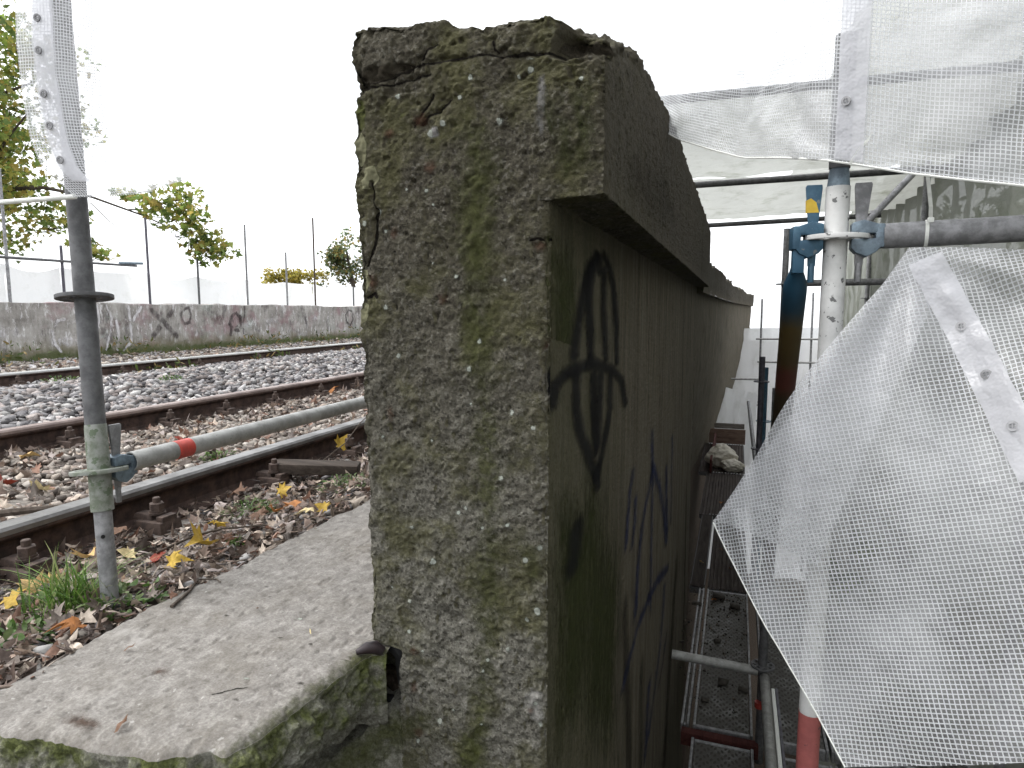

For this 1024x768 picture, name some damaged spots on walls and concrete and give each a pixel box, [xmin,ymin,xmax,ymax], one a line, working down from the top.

crack [361,40,567,128]
crack [367,183,381,267]